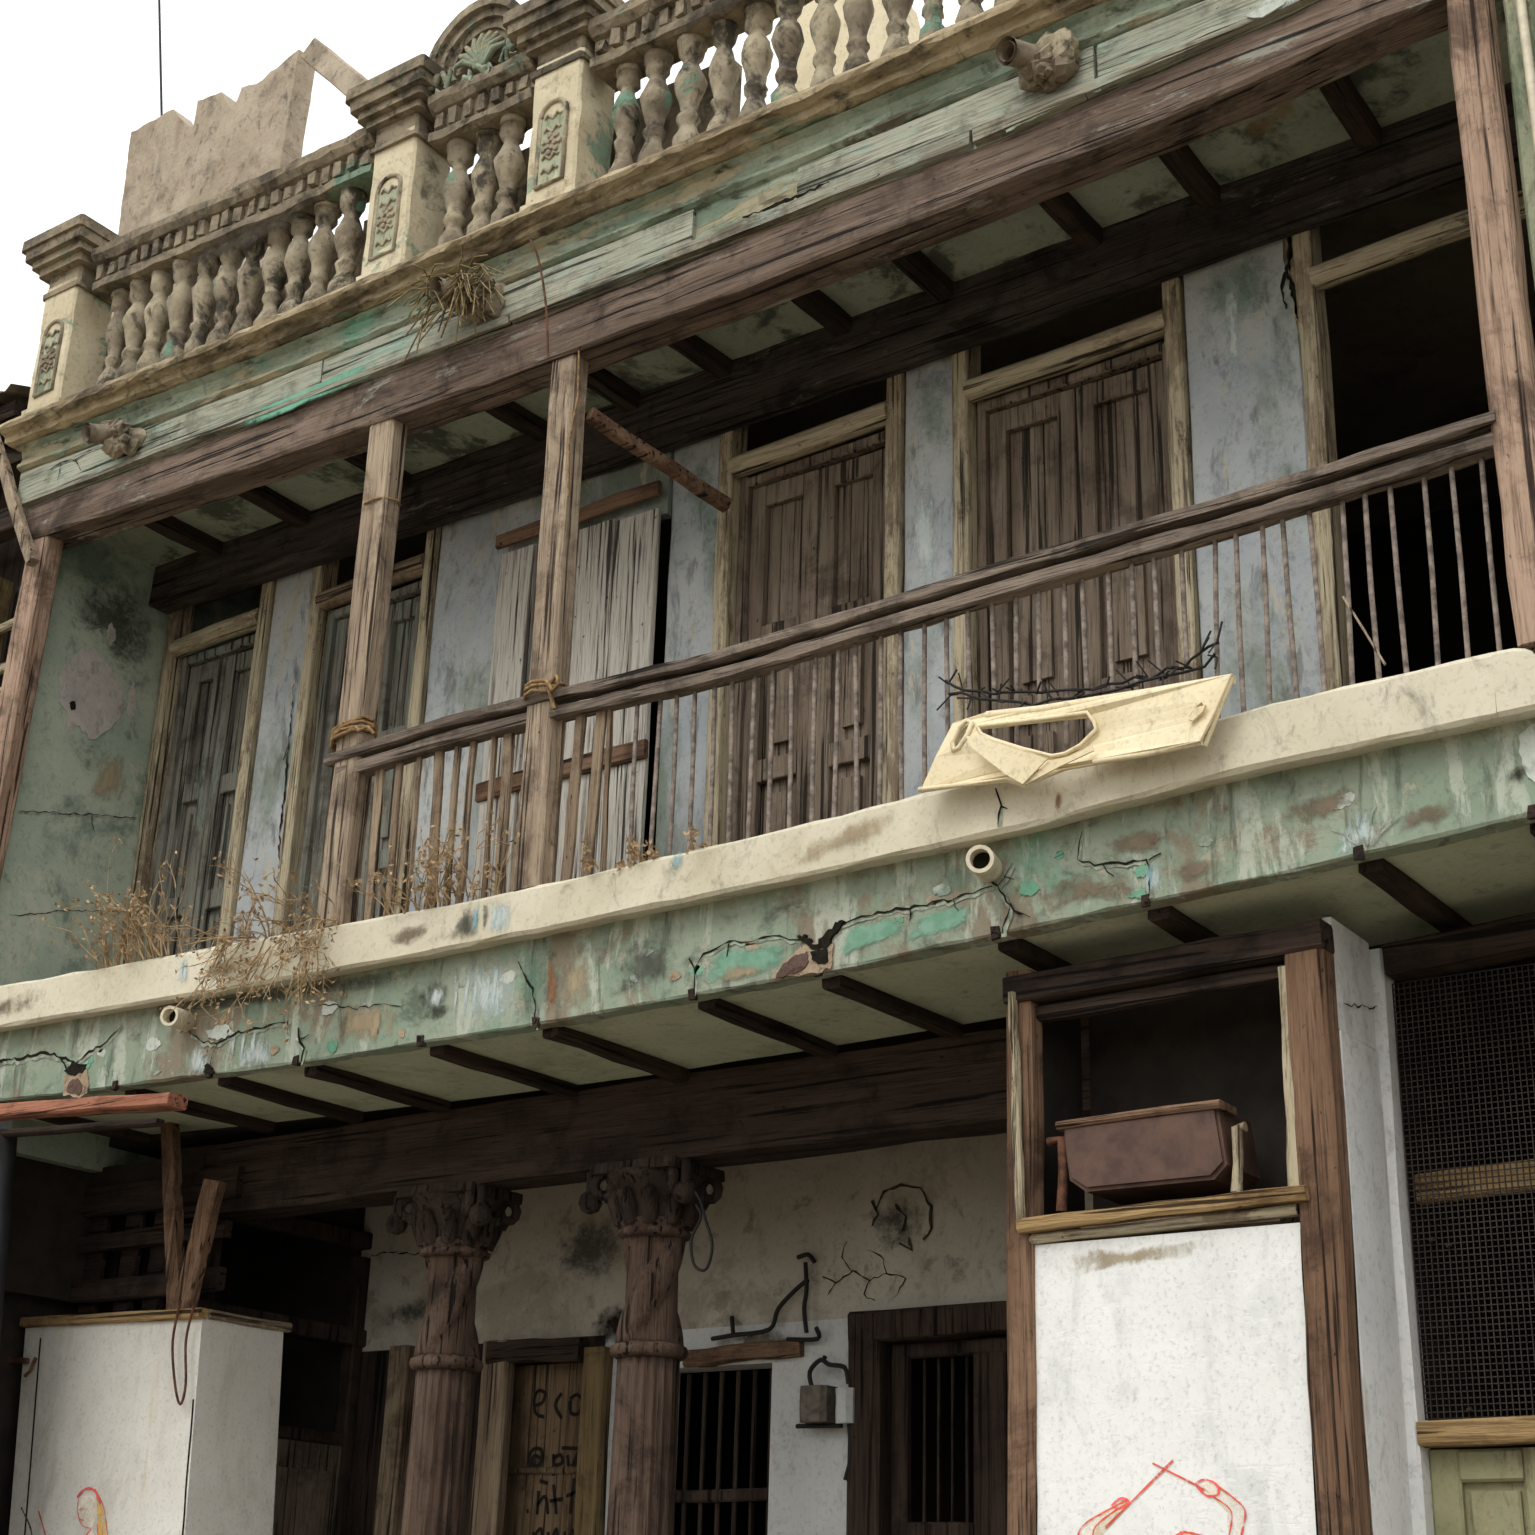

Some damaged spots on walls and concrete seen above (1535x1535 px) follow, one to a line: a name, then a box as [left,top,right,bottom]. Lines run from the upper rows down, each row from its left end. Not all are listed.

crack [1280,237,1301,350]
water stain [82,588,145,668]
peeling [58,623,136,770]
crack [1077,833,1161,898]
peeling [668,884,968,982]
peeling [499,970,517,984]
crack [689,935,802,996]
crack [0,1023,124,1069]
peeling [146,1037,161,1051]
crack [189,1004,404,1065]
peeling [321,1000,338,1016]
water stain [565,1226,617,1274]